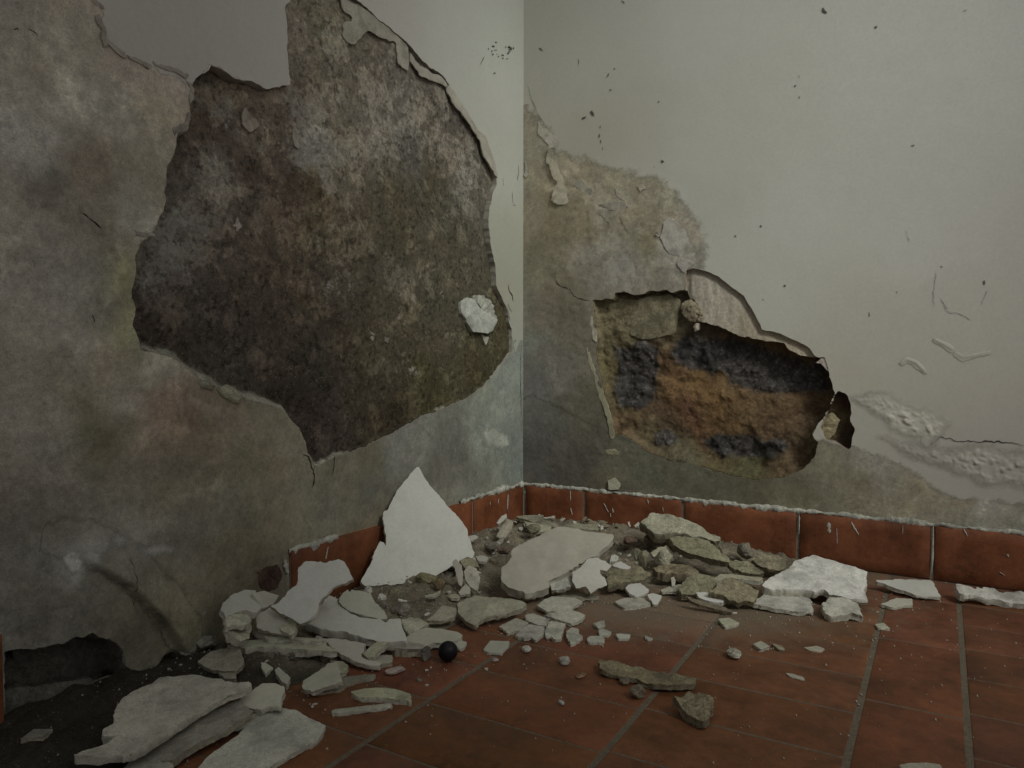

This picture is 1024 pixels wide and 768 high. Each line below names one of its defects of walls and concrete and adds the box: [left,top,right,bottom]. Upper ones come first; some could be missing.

peeling [0,0,855,716]
crack [931,436,1023,446]